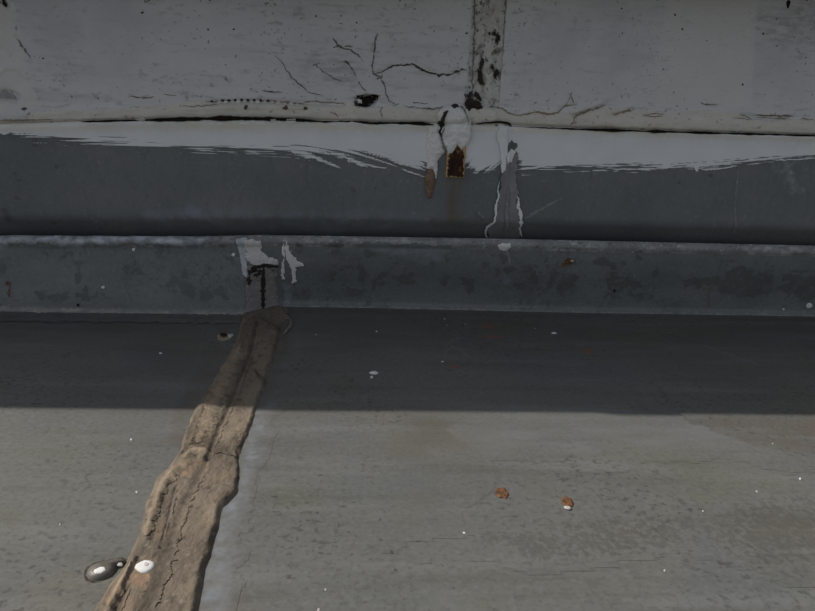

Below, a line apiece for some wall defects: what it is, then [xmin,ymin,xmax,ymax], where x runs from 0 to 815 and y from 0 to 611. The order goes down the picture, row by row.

crack [83,0,815,152]
water stain [474,0,675,114]
water stain [0,194,815,611]